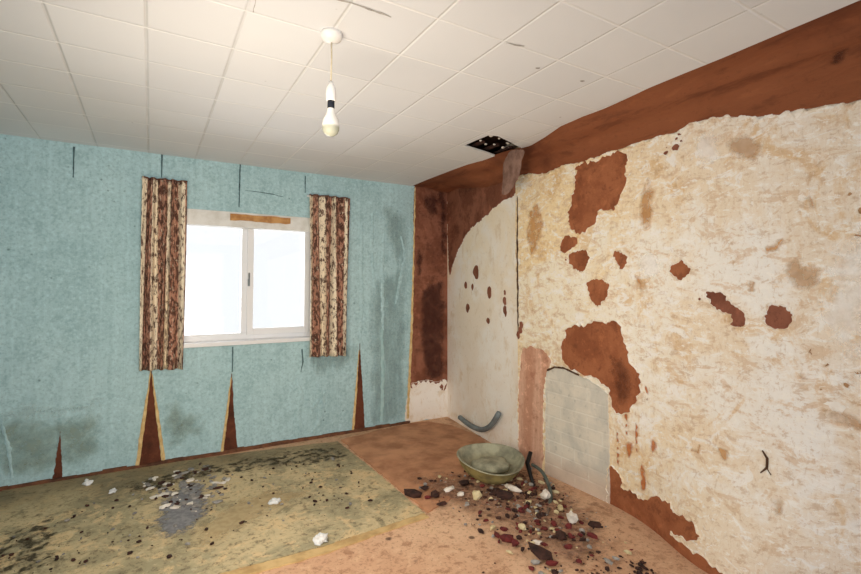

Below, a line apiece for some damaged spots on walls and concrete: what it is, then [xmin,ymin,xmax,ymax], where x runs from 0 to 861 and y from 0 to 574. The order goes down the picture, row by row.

crack [338,0,391,17]
flaking render [405,0,861,423]
spalling [516,319,643,471]
spalling [605,465,727,574]